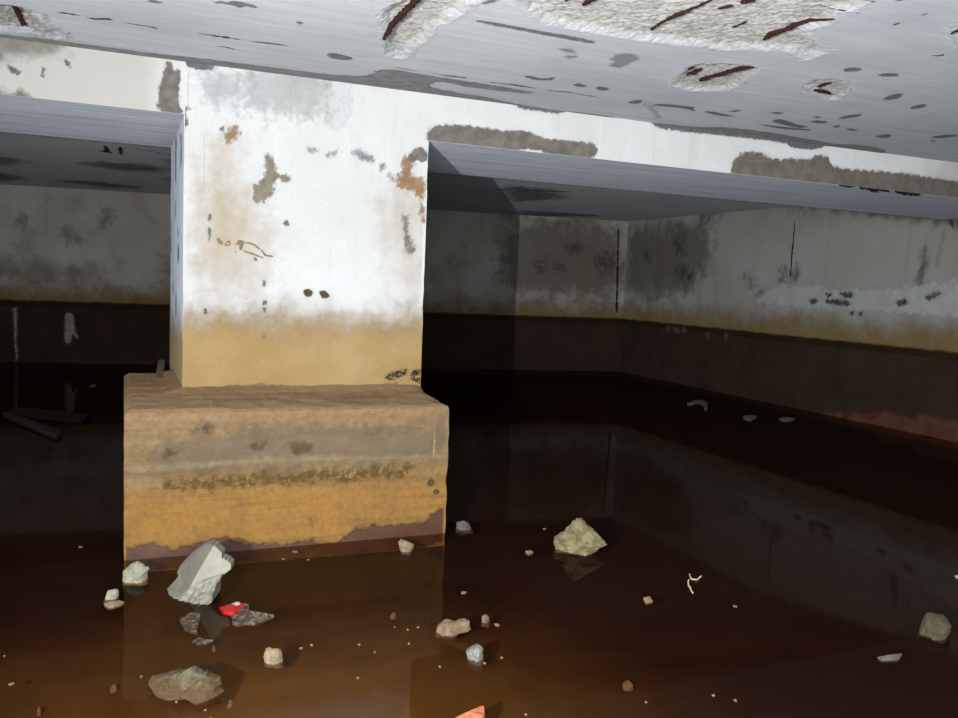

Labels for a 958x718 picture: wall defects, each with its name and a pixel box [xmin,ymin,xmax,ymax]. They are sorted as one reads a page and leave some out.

corrosion [397,156,425,222]
spalling [0,0,875,164]
peeling [653,104,958,198]
leakage [0,289,958,428]